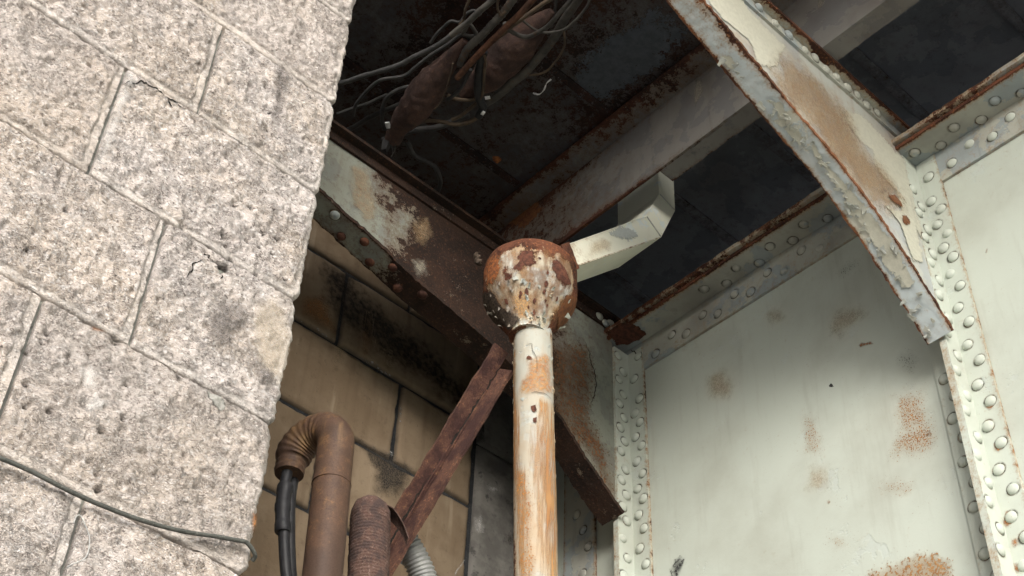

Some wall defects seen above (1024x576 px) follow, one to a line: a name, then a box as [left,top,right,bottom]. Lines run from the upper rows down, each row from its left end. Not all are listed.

crack [123,80,181,107]
peeling [717,54,745,79]
peeling [756,100,935,338]
rust [482,250,616,576]
rust [888,391,933,459]
rust [868,553,953,576]